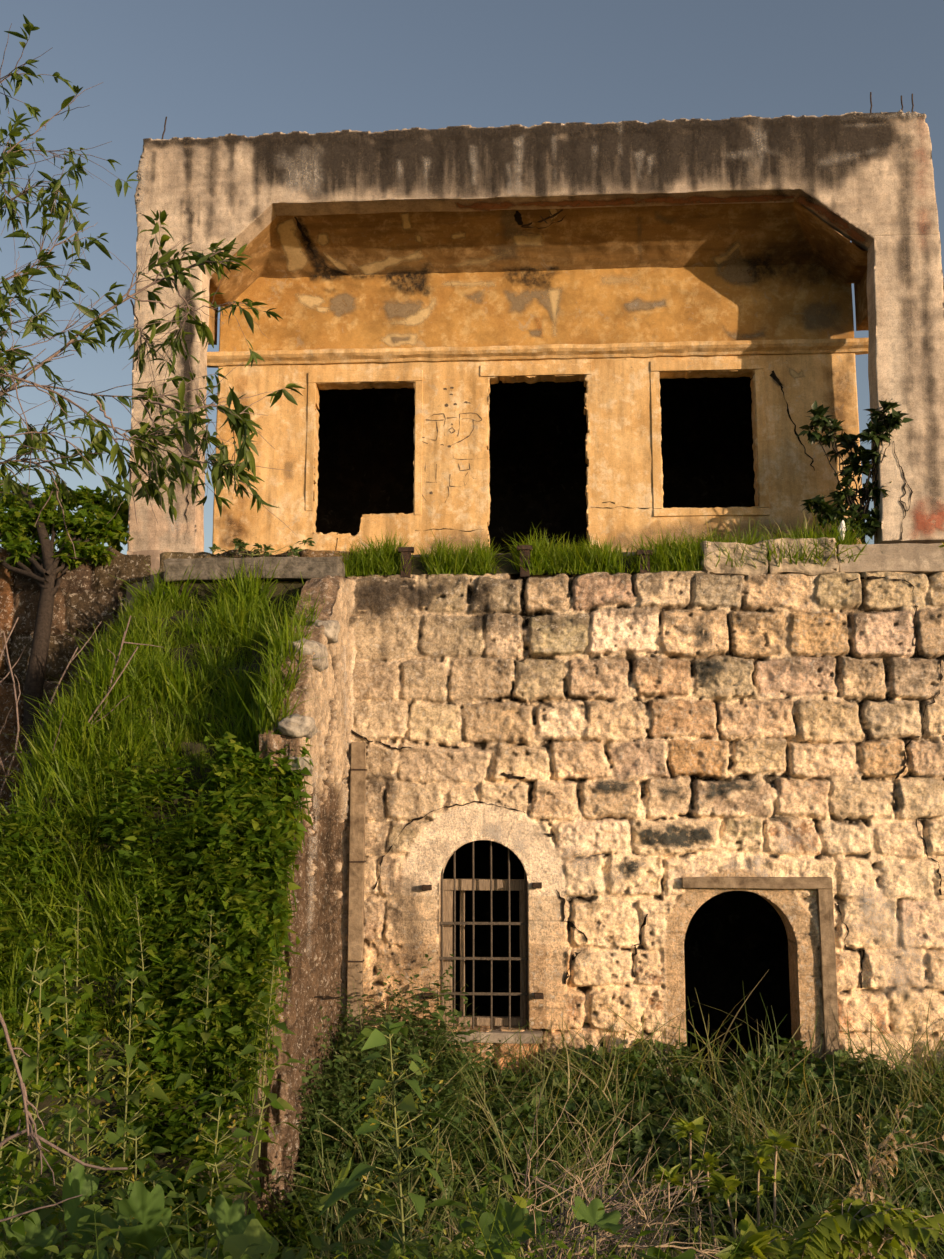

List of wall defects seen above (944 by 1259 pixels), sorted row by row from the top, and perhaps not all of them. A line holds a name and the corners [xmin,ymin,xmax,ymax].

peeling [277,219,307,271]
crack [294,217,350,280]
peeling [317,213,423,275]
water stain [355,264,430,295]
peeling [444,282,561,336]
water stain [144,111,927,286]
peeling [456,195,866,266]
water stain [927,371,939,509]
crack [893,441,913,540]
crack [556,890,588,984]
crack [632,914,648,978]
crack [835,902,865,988]